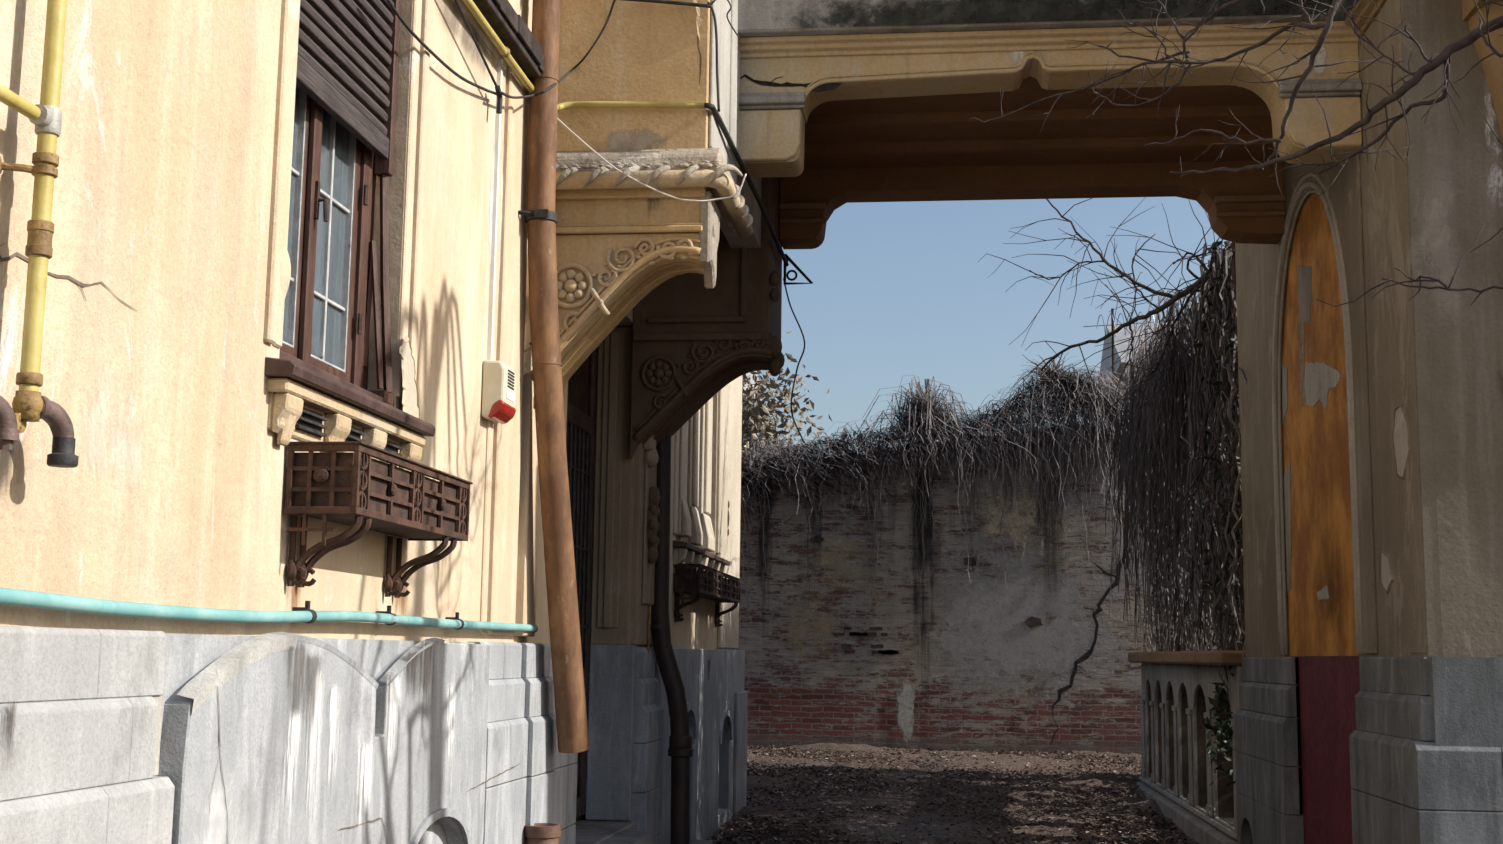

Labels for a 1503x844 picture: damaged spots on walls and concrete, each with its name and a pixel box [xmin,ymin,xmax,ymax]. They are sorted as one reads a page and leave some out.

water stain [794,0,1333,28]
crack [0,243,137,311]
flaking render [399,335,420,419]
peeling [1282,266,1342,423]
water stain [0,450,11,485]
water stain [756,469,777,596]
water stain [913,432,933,654]
peeling [1317,586,1330,601]
spalling [833,627,899,655]
water stain [287,645,339,807]
water stain [359,641,432,817]
water stain [446,687,455,760]